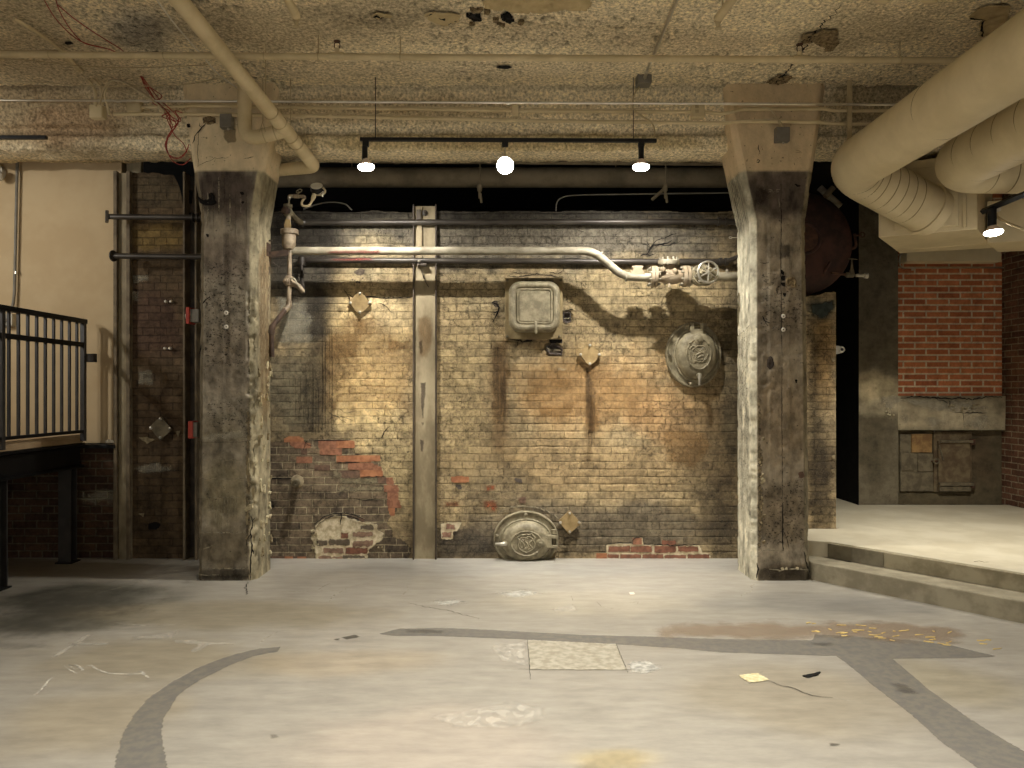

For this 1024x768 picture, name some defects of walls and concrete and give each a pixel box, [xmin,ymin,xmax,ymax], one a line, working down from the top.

crack [640,233,680,257]
peeling [208,361,411,577]
flaking render [596,537,711,559]